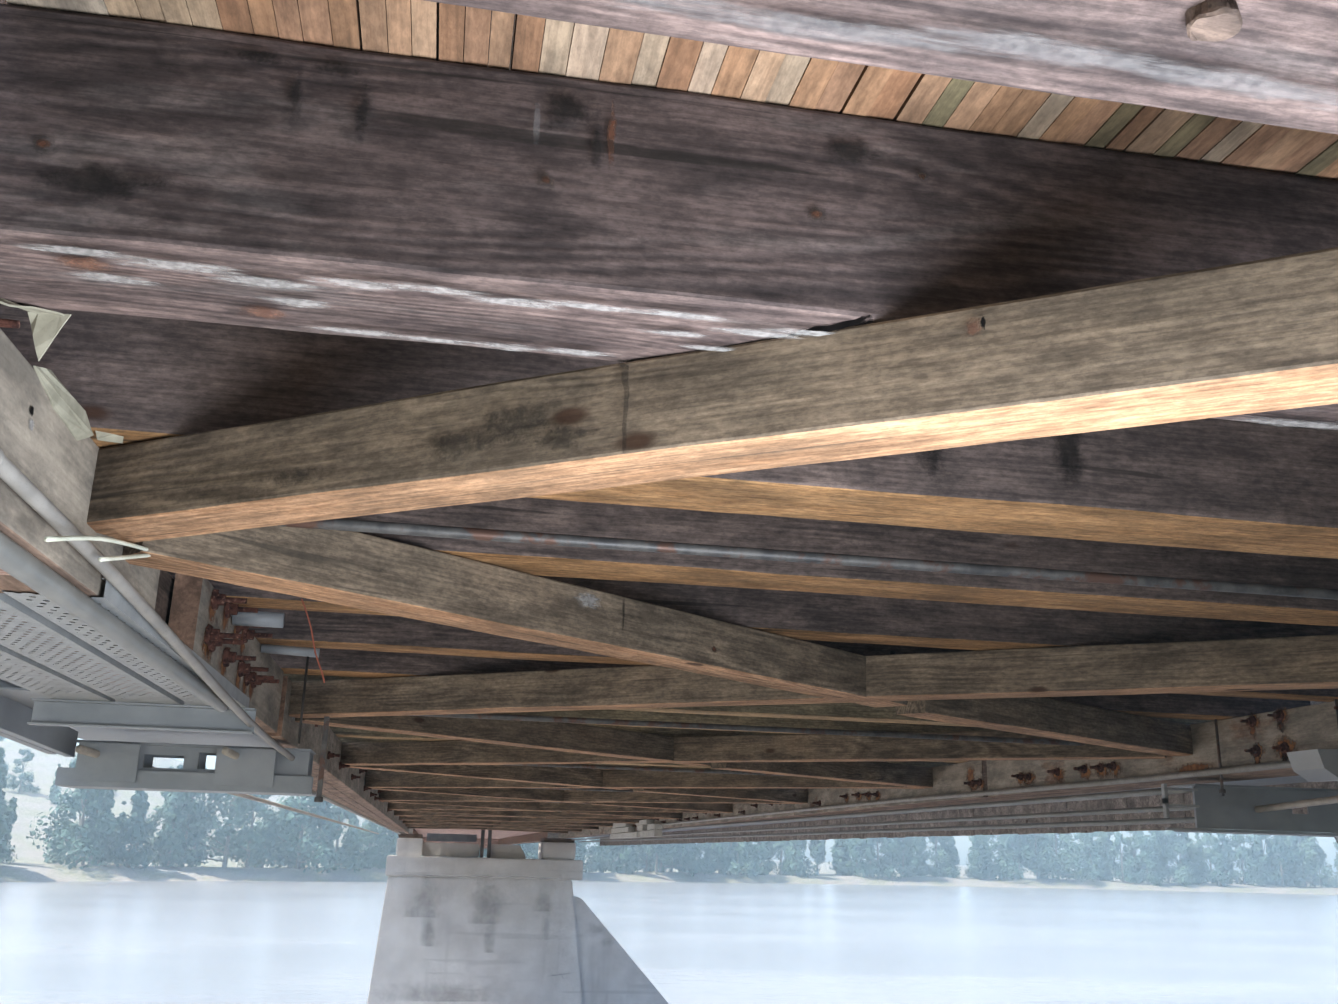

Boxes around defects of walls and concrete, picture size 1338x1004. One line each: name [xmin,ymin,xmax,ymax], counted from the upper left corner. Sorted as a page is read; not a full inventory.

crack [619,363,629,446]
corrosion [1176,763,1213,772]